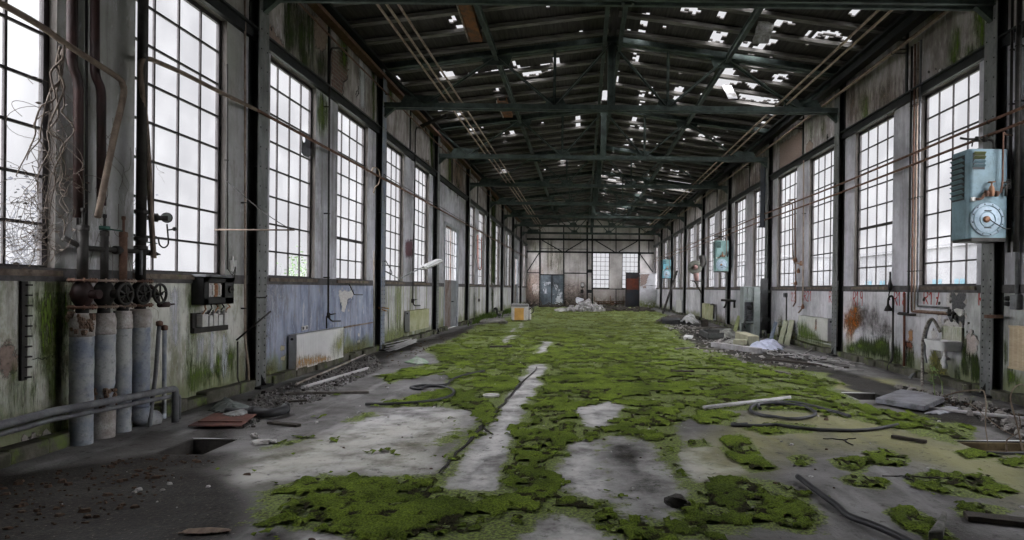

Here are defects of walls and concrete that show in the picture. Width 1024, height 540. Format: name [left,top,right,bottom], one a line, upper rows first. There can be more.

peeling [339,289,354,312]
damp [187,333,236,395]